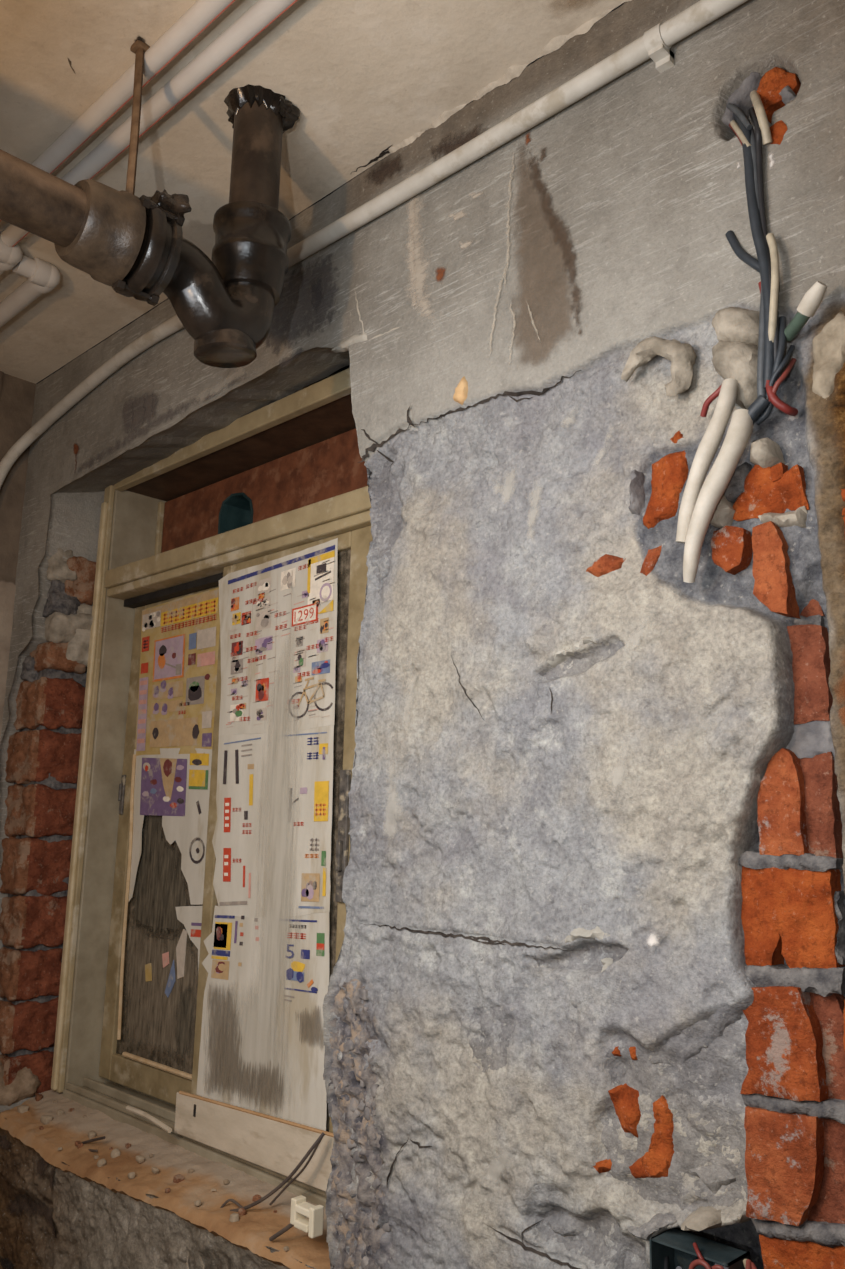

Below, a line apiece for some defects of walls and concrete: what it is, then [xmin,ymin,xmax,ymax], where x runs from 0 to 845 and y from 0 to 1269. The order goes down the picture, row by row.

water stain [490,134,581,364]
crack [358,370,582,472]
flaking render [534,430,845,1269]
crack [362,923,573,951]
crack [487,1219,580,1269]